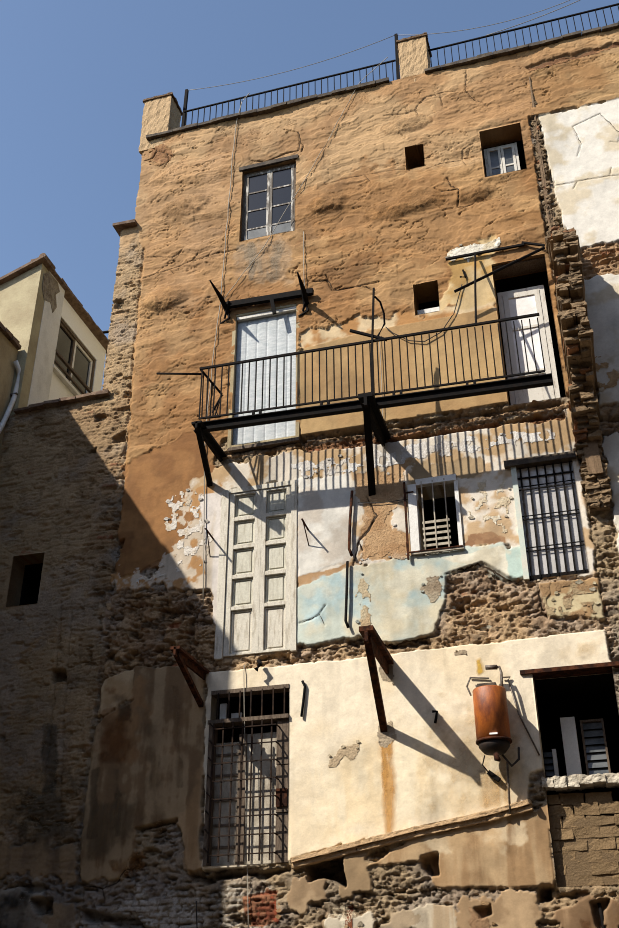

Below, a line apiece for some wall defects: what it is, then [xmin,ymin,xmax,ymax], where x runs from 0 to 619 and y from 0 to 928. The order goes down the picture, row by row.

flaking render [445,237,501,262]
flaking render [595,356,619,393]
peeling [136,489,213,583]
crack [353,498,377,565]
peeling [291,429,555,626]
spalling [420,564,600,655]
water stain [18,725,71,839]
flaking render [328,740,360,767]
corrosion [381,744,393,832]
spalling [247,896,282,926]
flaking render [328,902,363,928]
spalling [468,901,496,928]